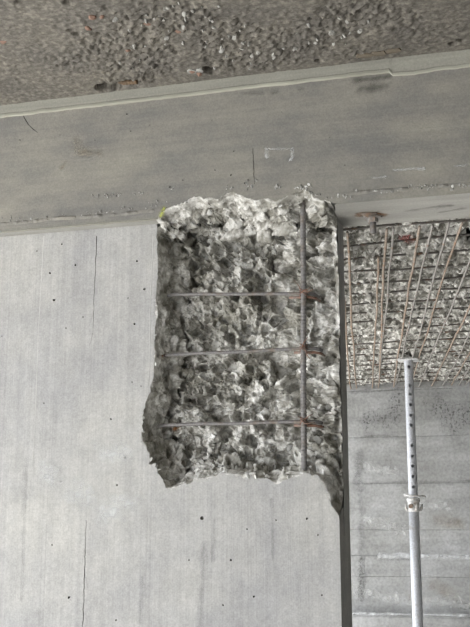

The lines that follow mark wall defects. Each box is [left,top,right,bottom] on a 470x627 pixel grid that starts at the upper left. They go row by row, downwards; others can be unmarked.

spalling [141,189,470,517]